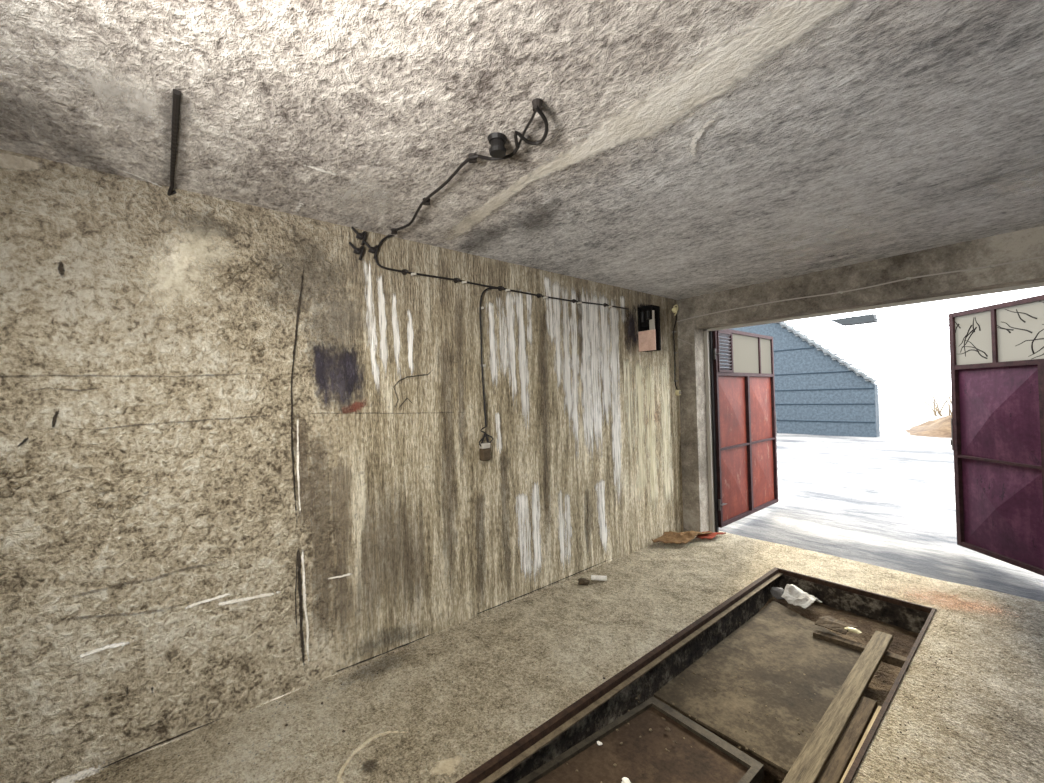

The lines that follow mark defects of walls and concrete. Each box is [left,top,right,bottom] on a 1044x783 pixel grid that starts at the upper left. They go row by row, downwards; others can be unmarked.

damp [364,263,414,385]
crack [0,375,102,427]
crack [291,271,304,521]
crack [359,372,431,414]
damp [442,302,463,557]
damp [486,277,673,577]
crack [295,549,310,669]
crack [336,633,434,672]
damp [476,496,485,591]
crack [478,558,613,614]
crack [97,719,219,770]